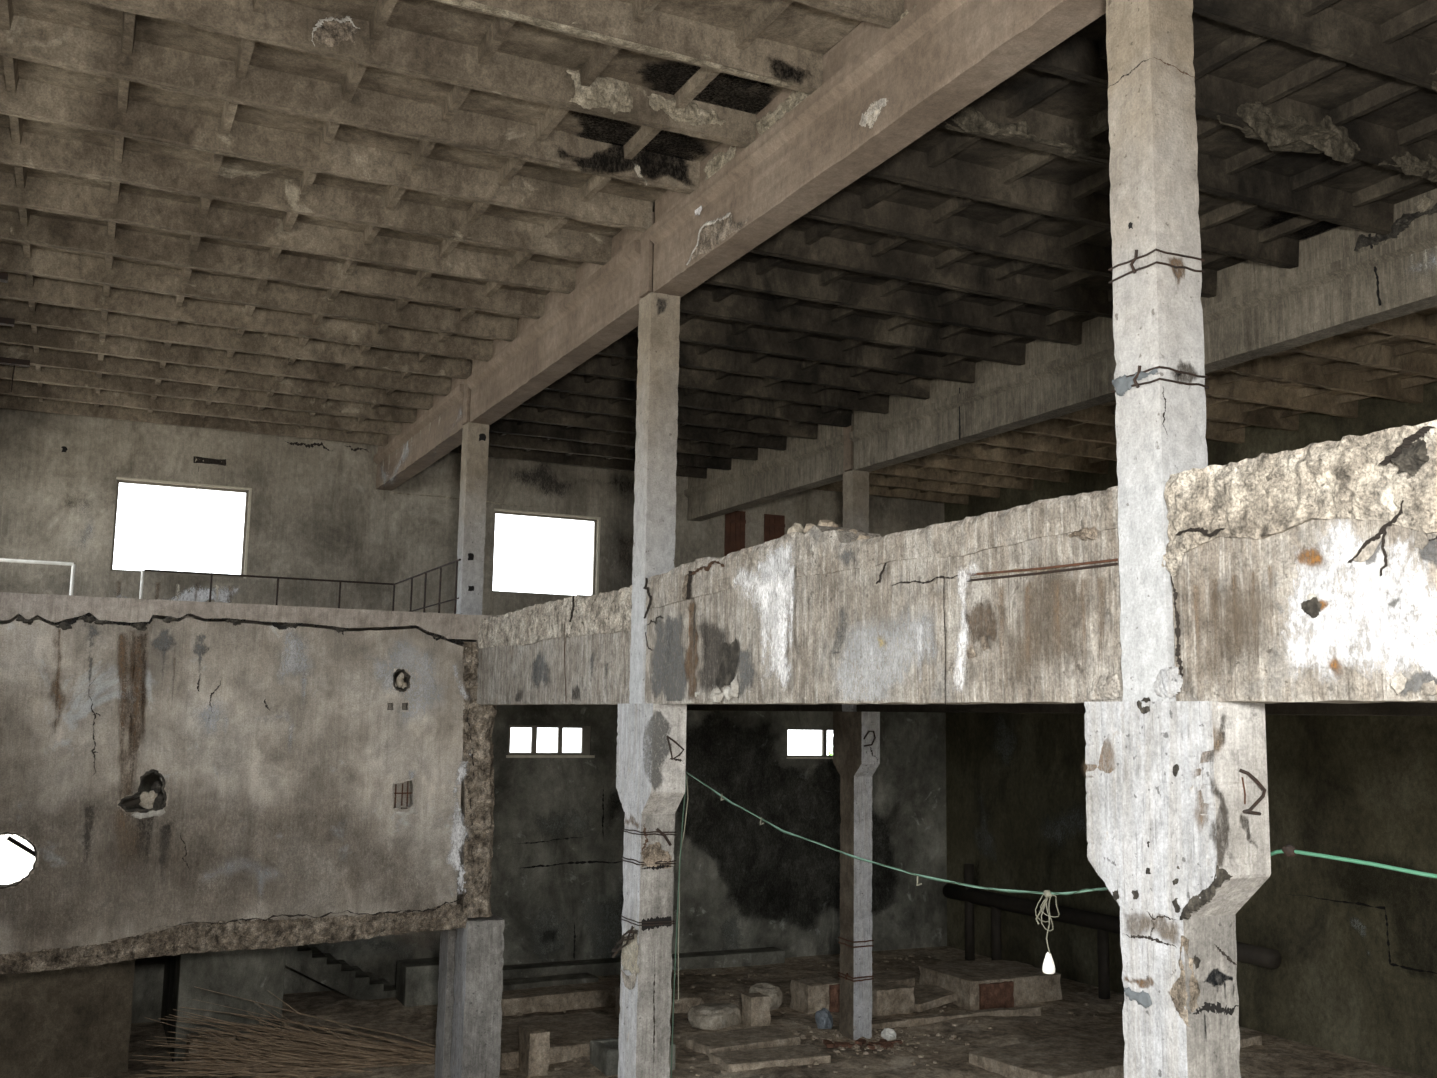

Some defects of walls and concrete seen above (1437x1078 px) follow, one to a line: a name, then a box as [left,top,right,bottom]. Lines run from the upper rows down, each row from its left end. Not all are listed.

peeling [434,0,809,135]
spalling [1217,101,1360,163]
spalling [1161,420,1437,689]
corrosion [1298,549,1321,564]
crack [1348,500,1404,576]
corrosion [118,634,147,856]
crack [16,613,349,635]
spalling [0,486,1118,974]
corrosion [684,601,699,700]
water stain [643,544,841,950]
peeling [1391,671,1437,696]
water stain [871,813,896,912]